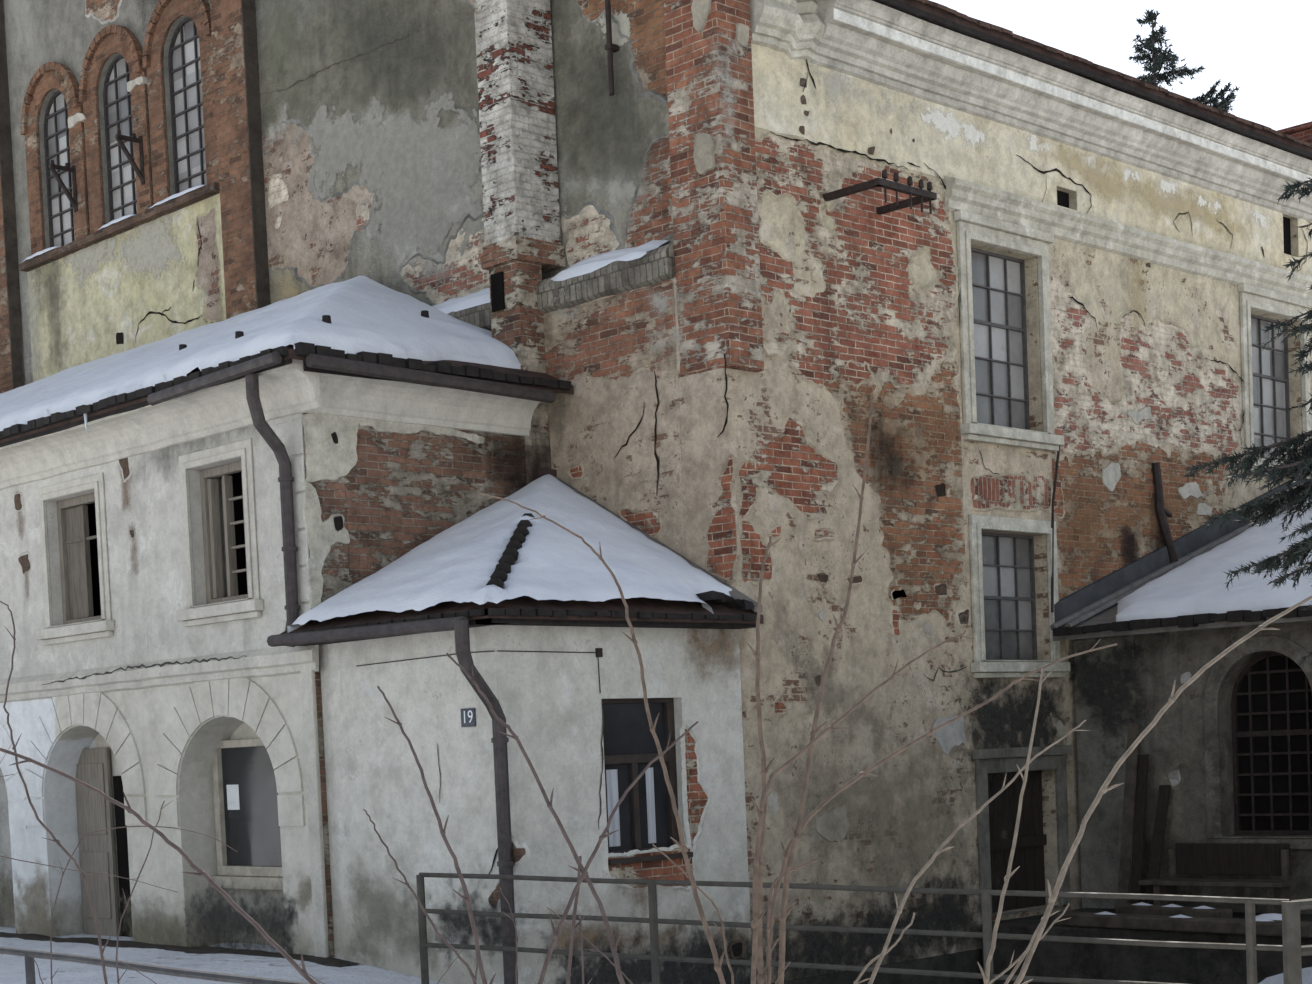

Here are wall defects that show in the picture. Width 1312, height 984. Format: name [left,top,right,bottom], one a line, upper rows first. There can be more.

peeling [262,118,375,290]
flaking render [398,213,490,306]
crack [1016,154,1092,213]
crack [135,307,202,344]
crack [614,371,660,488]
crack [718,353,729,437]
flaking render [705,95,1244,643]
damp [958,642,1147,780]
flaking render [603,722,710,901]